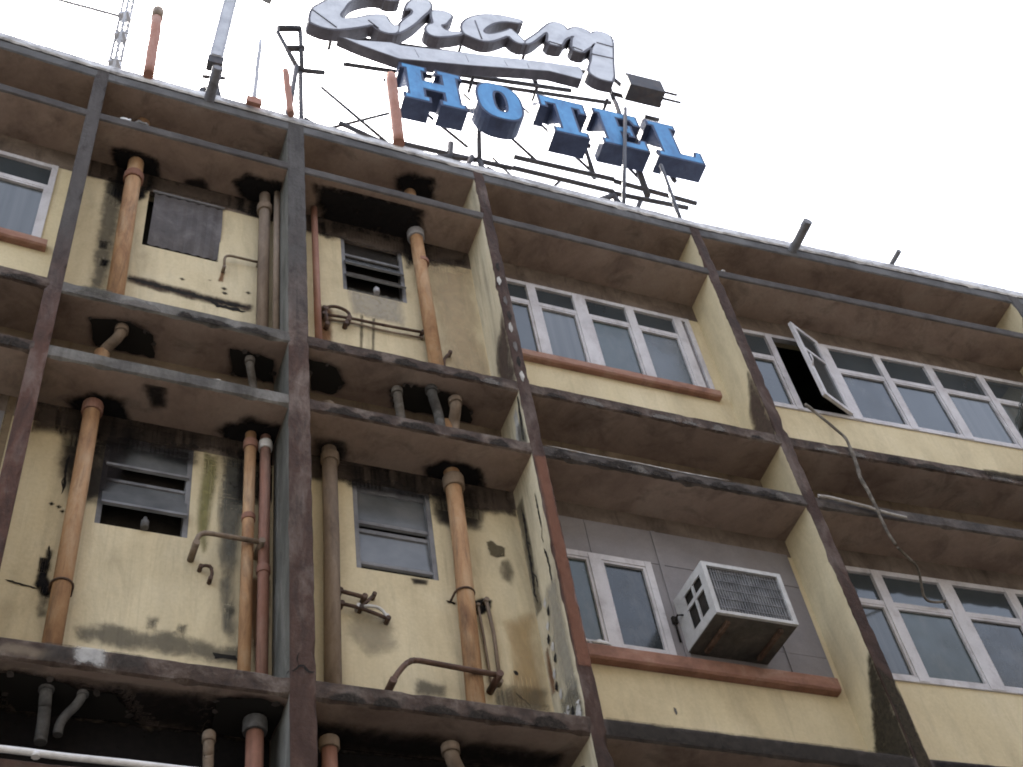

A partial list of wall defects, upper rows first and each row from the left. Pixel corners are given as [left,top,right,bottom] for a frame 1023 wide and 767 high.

water stain [81,183,121,298]
water stain [5,546,52,615]
water stain [199,454,244,633]
water stain [40,620,238,670]